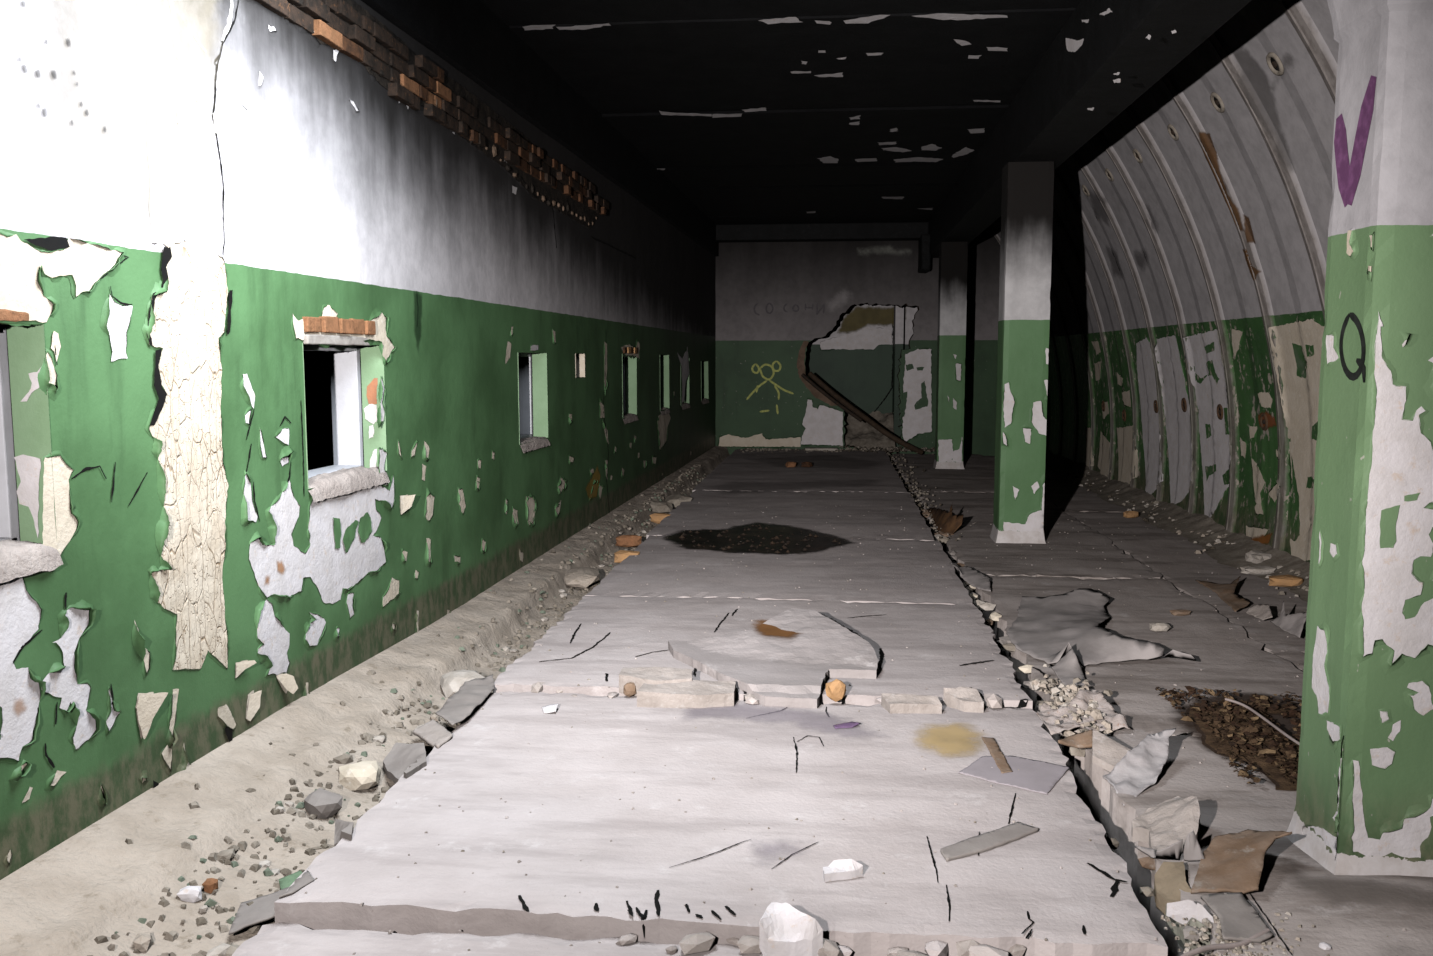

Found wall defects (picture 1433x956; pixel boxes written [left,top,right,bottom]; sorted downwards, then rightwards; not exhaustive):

crack [73,247,172,426]
flaking render [0,229,435,730]
crack [212,0,239,256]
crack [226,290,234,334]
leakage [665,522,852,554]
peeling [1085,312,1340,568]
rust [1199,133,1260,280]
peeling [1352,312,1433,675]
peeling [0,577,191,803]
flaking render [1302,622,1433,859]
crack [926,836,950,921]
crack [1087,863,1127,897]